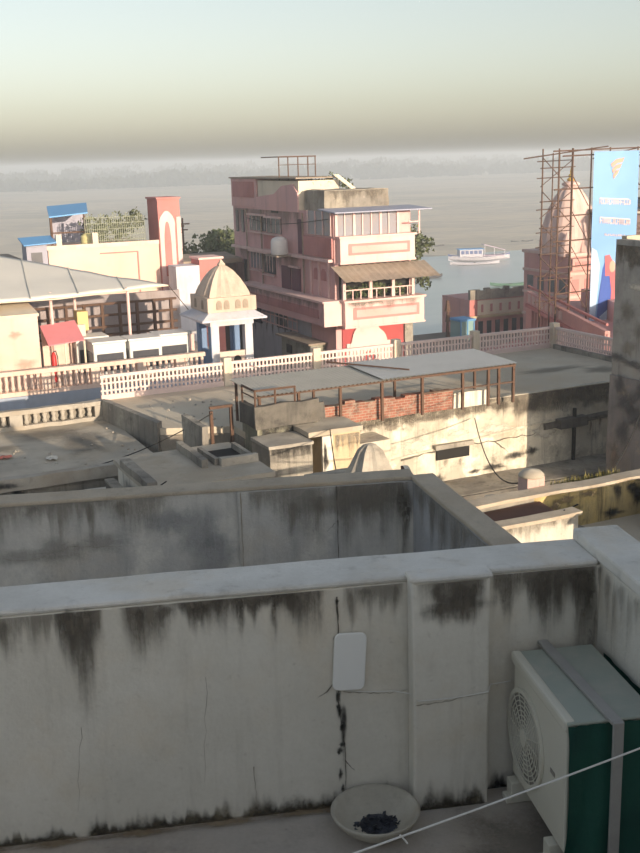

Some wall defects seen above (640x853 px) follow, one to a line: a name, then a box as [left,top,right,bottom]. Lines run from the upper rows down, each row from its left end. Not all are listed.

water stain [618,245,640,267]
water stain [31,497,155,525]
water stain [615,483,640,503]
water stain [0,610,100,678]
water stain [124,591,321,644]
crack [333,597,341,633]
water stain [428,579,483,619]
water stain [494,566,601,645]
water stain [336,693,346,755]
crack [319,685,487,769]
water stain [0,798,335,851]